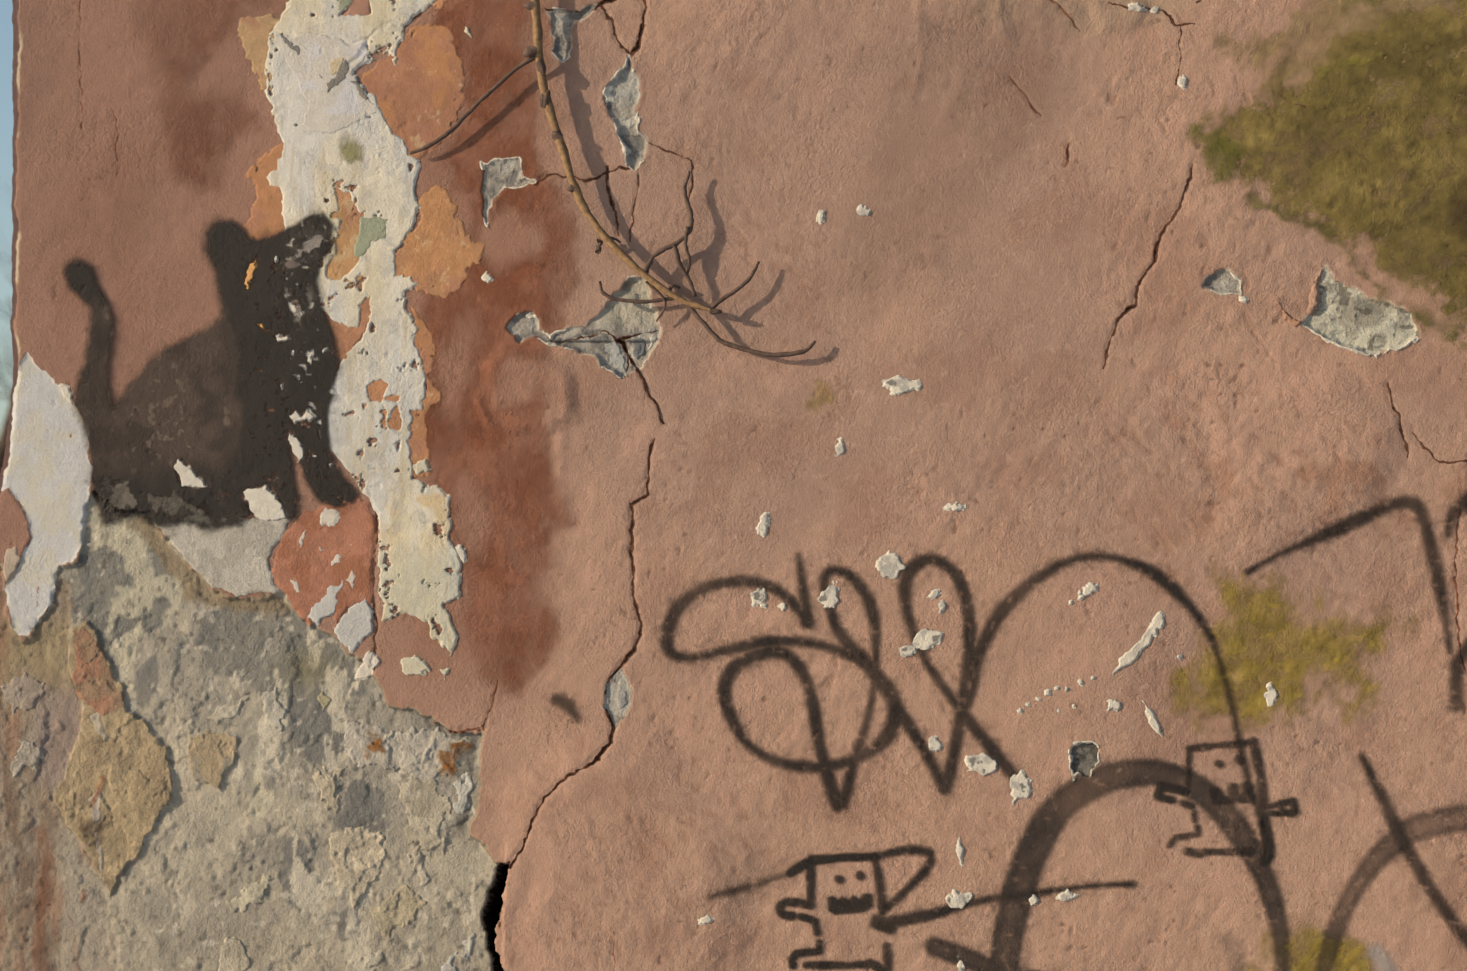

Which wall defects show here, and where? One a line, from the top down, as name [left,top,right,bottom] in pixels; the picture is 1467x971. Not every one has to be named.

flaking render [550,4,596,63]
crack [544,0,647,56]
flaking render [602,55,648,170]
crack [534,142,694,242]
flaking render [507,275,660,378]
crack [1102,164,1193,369]
flaking render [1277,268,1420,358]
crack [1387,382,1467,464]
flaking render [0,0,537,971]
crack [1452,512,1467,673]
crack [483,330,664,971]
flaking render [604,668,632,728]